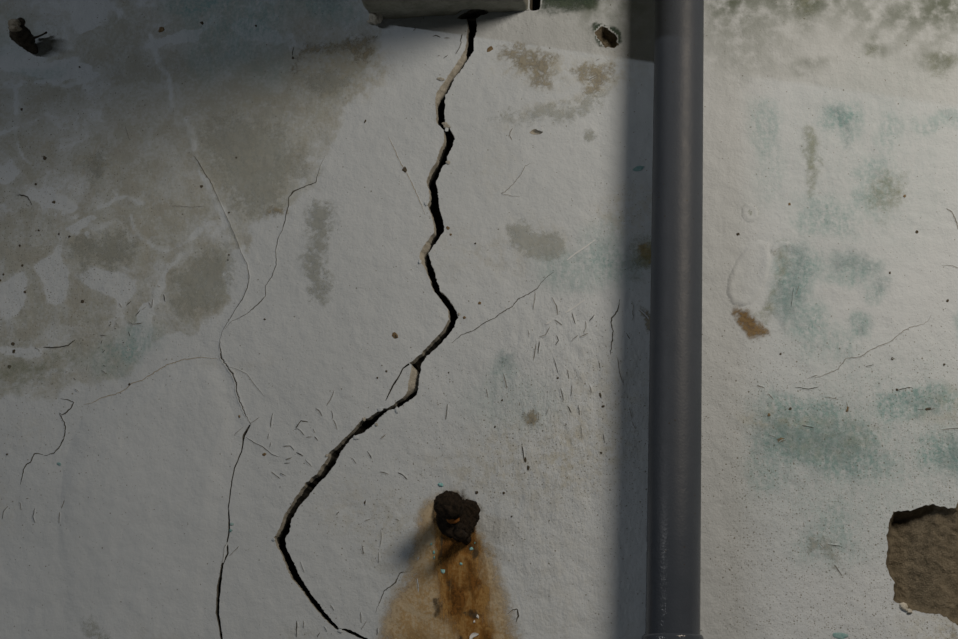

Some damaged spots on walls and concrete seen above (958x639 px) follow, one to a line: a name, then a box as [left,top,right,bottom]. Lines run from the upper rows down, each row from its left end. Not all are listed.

crack [17,194,32,205]
crack [20,155,326,639]
crack [272,9,554,639]
corrosion [381,492,517,639]
spalling [886,503,958,625]